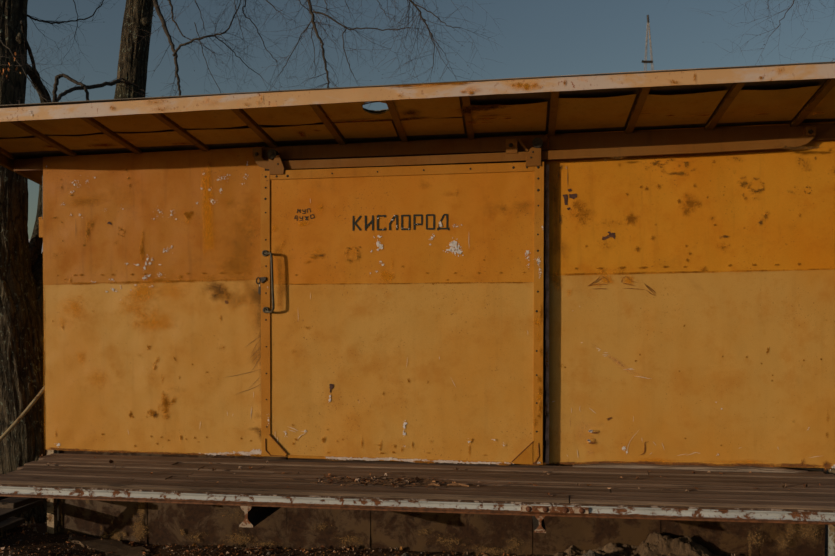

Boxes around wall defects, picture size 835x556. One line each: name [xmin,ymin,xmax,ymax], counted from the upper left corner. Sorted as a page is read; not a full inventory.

peeling [445,240,463,257]
rust [43,351,202,455]